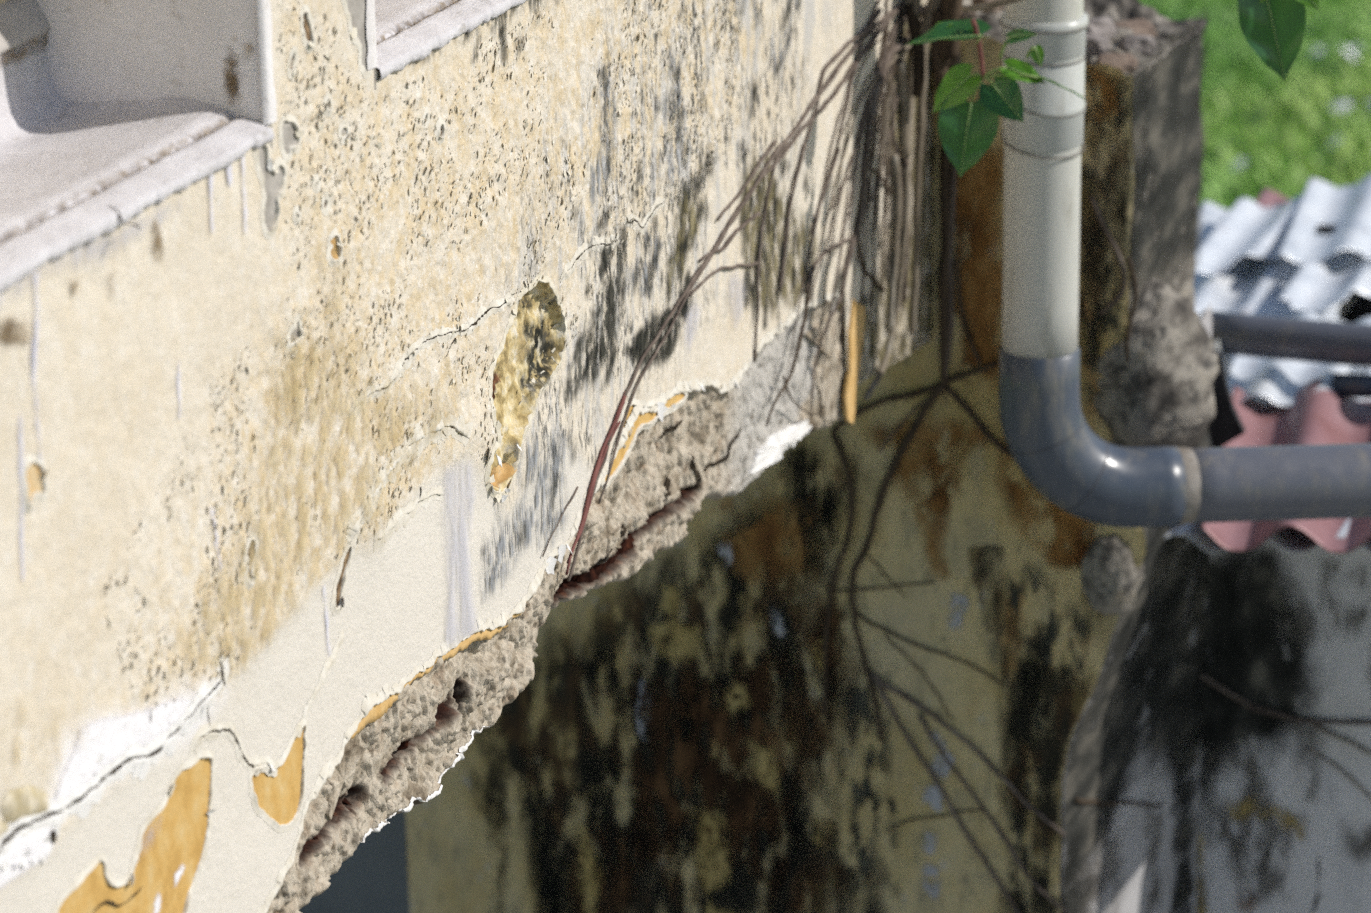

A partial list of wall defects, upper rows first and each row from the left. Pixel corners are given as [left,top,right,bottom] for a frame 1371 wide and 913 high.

leakage [465,0,539,61]
leakage [566,56,717,400]
leakage [740,145,817,328]
peeling [0,820,59,888]
peeling [19,454,49,515]
crack [93,889,141,913]
peeling [53,749,216,913]
crack [0,640,278,857]
peeling [54,347,262,803]
spalling [248,288,865,913]
leakage [479,436,896,913]
leakage [968,526,1315,913]